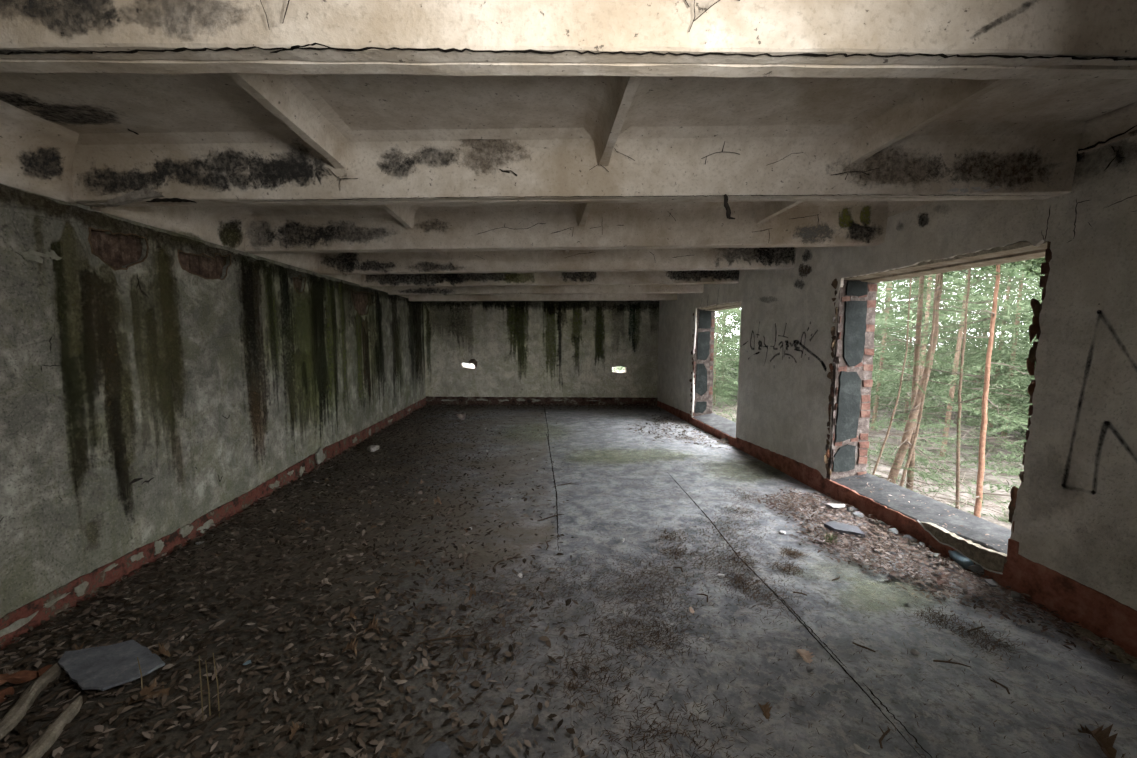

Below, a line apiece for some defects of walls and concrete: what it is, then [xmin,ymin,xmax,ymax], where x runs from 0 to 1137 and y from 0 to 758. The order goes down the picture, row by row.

damp [0,0,115,36]
crack [4,43,1137,61]
damp [84,140,326,195]
damp [378,148,455,176]
crack [1076,125,1137,171]
crack [266,193,892,201]
crack [920,195,1137,243]
damp [0,184,659,510]
spalling [1026,298,1041,396]
spalling [1008,471,1024,532]
peeling [179,519,214,538]
peeling [102,540,164,573]